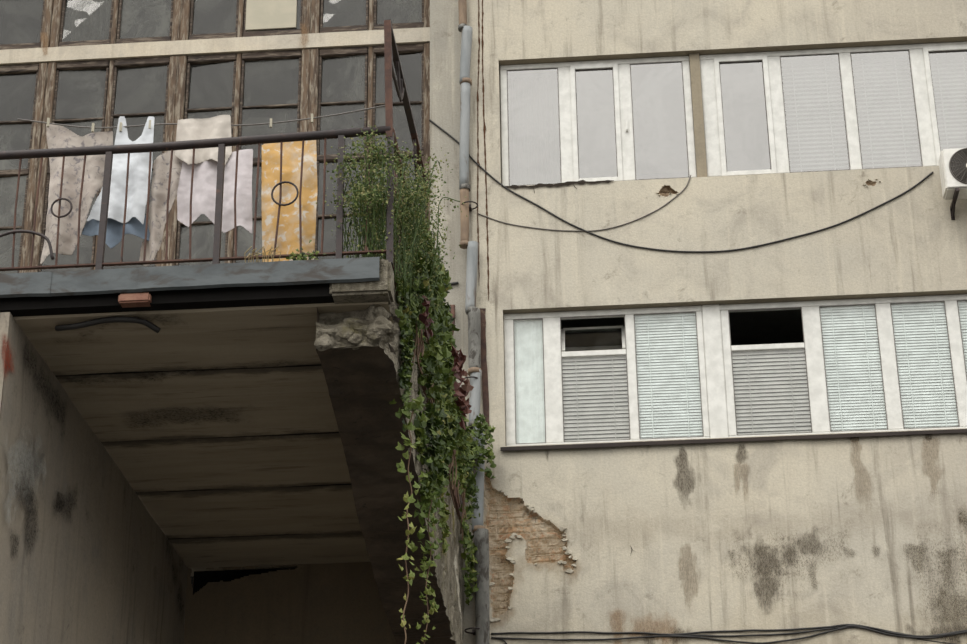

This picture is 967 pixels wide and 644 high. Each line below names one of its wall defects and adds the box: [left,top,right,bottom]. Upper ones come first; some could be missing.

spalling [656,185,679,197]
spalling [314,306,399,351]
water stain [676,450,694,491]
spalling [484,472,578,622]
water stain [748,534,820,604]